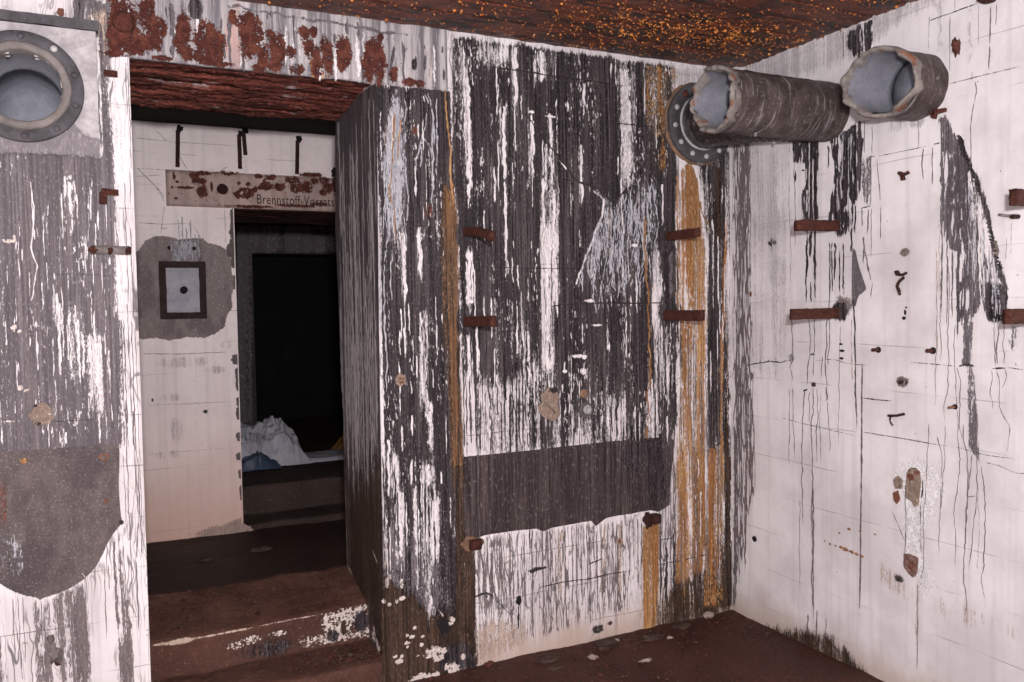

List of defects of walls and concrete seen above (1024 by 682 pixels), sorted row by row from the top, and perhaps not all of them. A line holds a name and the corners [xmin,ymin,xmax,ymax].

water stain [188,0,203,33]
rust [99,0,425,88]
rust [171,170,336,209]
water stain [0,0,144,682]
water stain [220,4,755,673]
rust [643,219,652,439]
rust [675,163,732,608]
water stain [766,121,881,671]
water stain [897,82,1017,663]
peeling [0,444,124,600]
rust [642,524,660,629]
spalling [893,468,923,610]